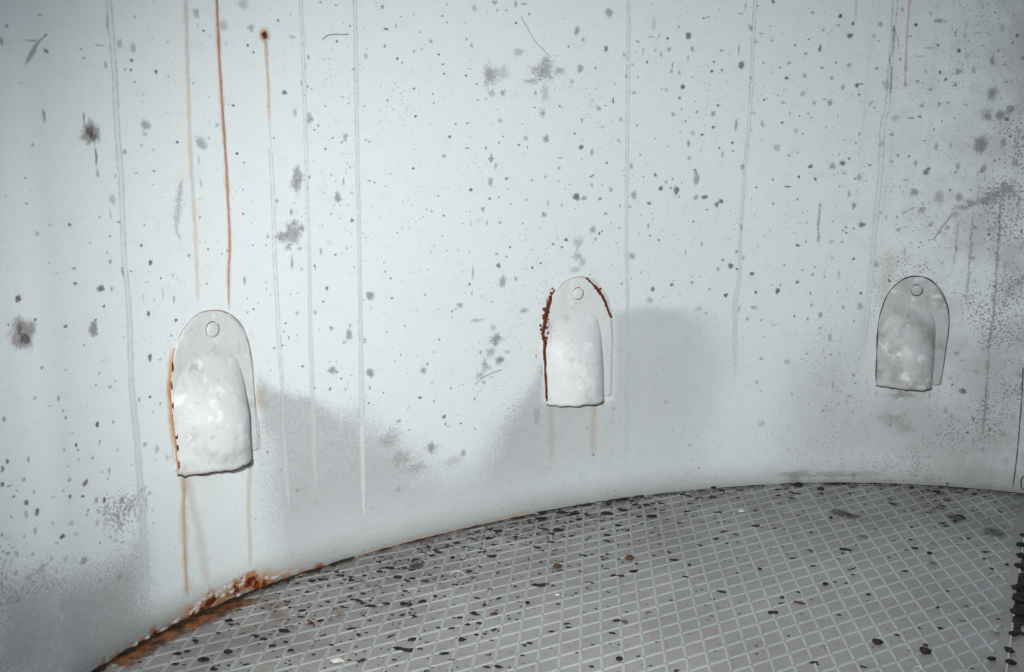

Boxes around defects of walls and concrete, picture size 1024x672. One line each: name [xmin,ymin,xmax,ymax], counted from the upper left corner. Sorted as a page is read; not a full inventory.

rust [216,0,230,253]
rust [539,288,555,401]
rust [586,277,612,318]
rust [168,348,184,519]
rust [102,572,269,666]